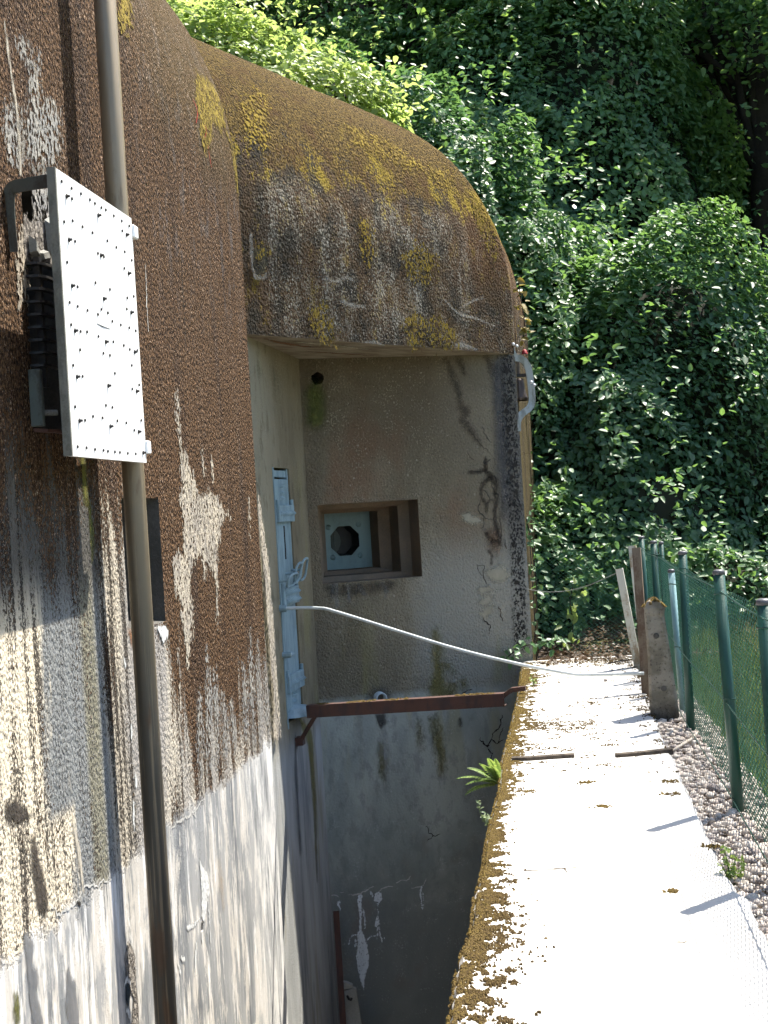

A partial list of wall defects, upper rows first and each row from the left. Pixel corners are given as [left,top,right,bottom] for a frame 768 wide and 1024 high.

crack [468,427,507,584]
crack [480,715,504,759]
leakage [6,799,30,824]
leakage [31,835,49,917]
leakage [73,818,83,888]
efflorescence [348,892,385,990]